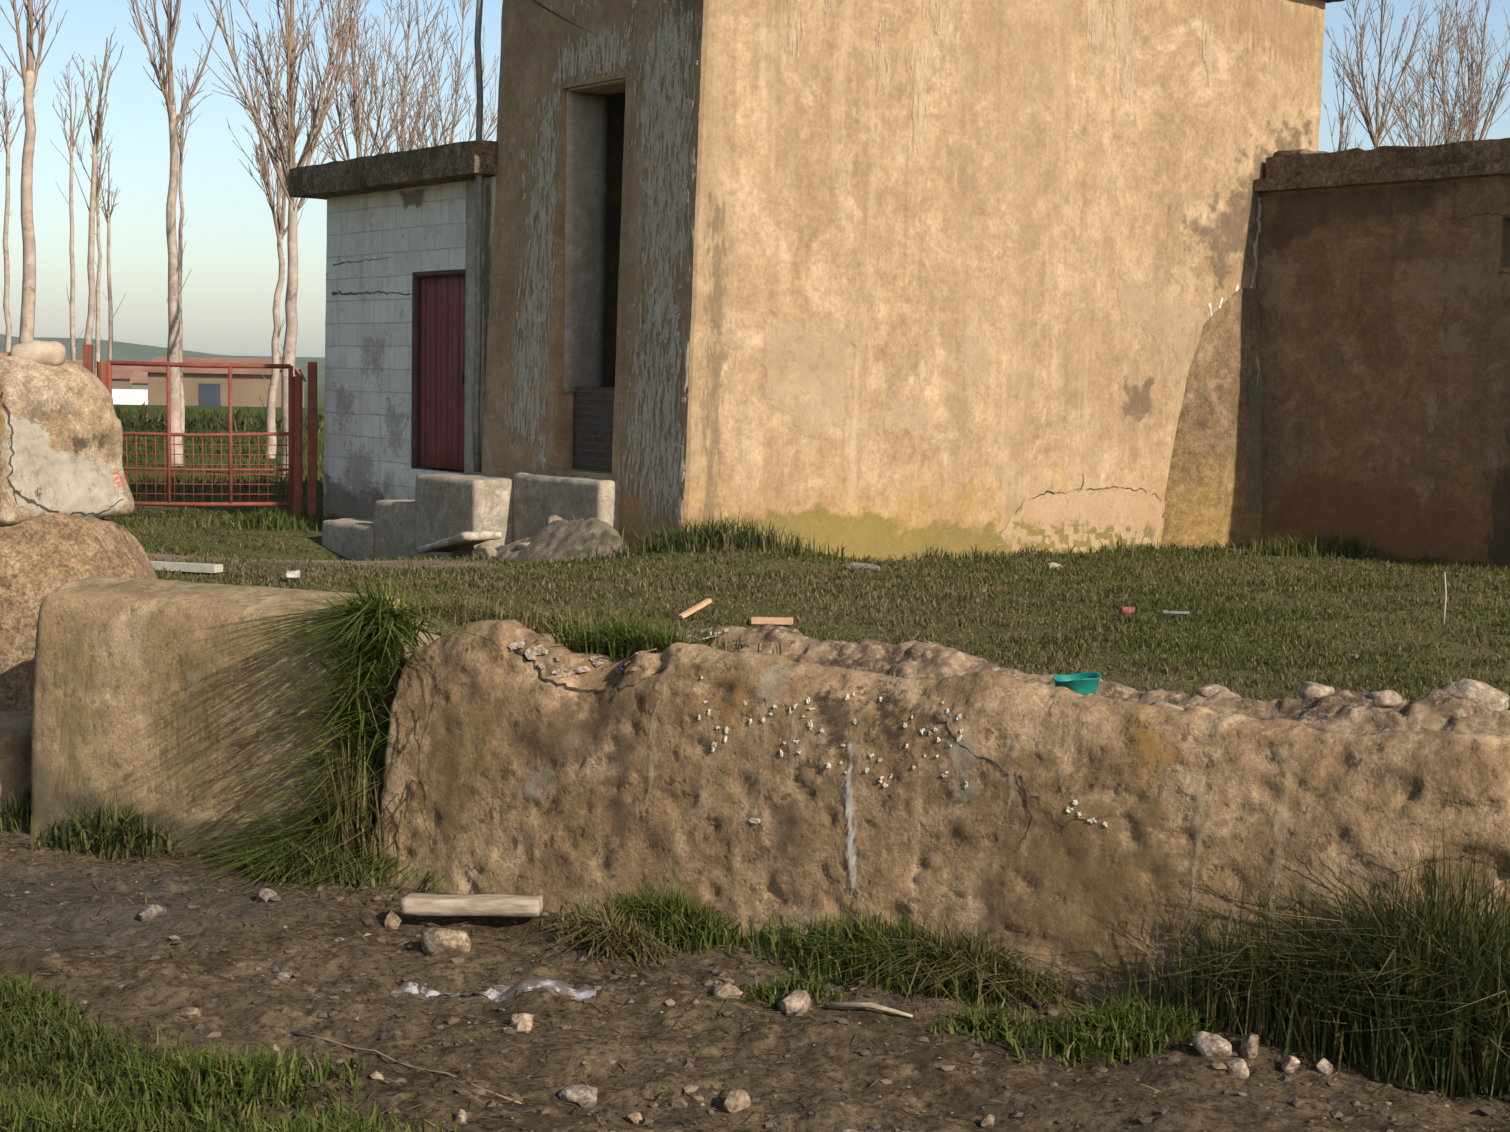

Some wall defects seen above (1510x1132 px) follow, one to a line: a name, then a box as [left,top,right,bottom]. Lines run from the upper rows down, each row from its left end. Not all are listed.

peeling [502,0,705,533]
damp [1184,121,1445,327]
crack [0,392,123,516]
crack [1001,475,1167,532]
damp [1483,467,1510,569]
crack [935,715,1111,851]